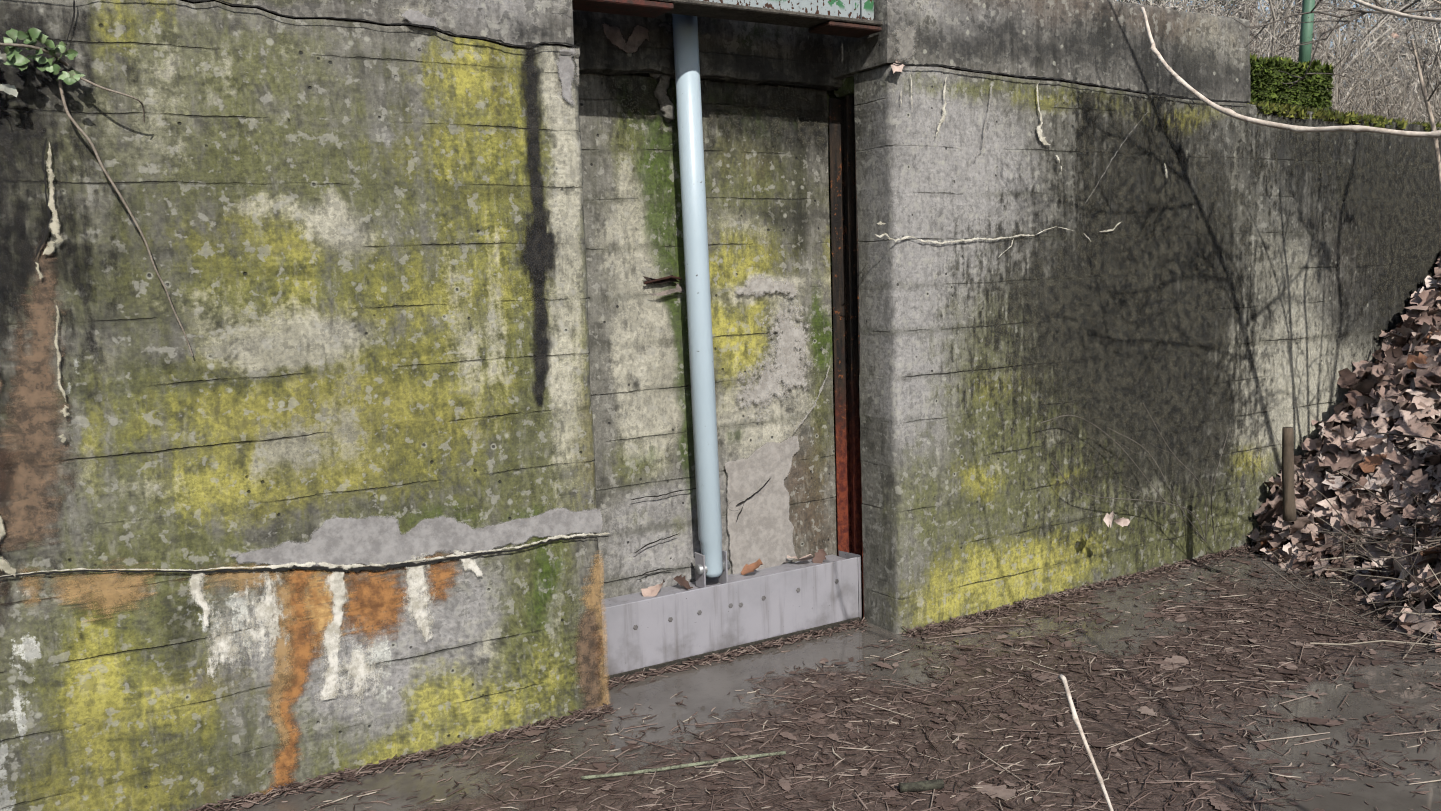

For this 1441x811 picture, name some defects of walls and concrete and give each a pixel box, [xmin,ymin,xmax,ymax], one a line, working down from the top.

crack [188,0,578,47]
leakage [0,0,96,417]
crack [34,138,63,279]
leakage [521,42,557,406]
crack [876,62,1250,257]
corrosion [0,243,71,550]
leakage [941,81,1441,572]
corrosion [202,566,408,794]
crack [0,532,678,578]
leakage [320,571,382,703]
peeling [230,508,603,567]
corrosion [576,558,609,711]